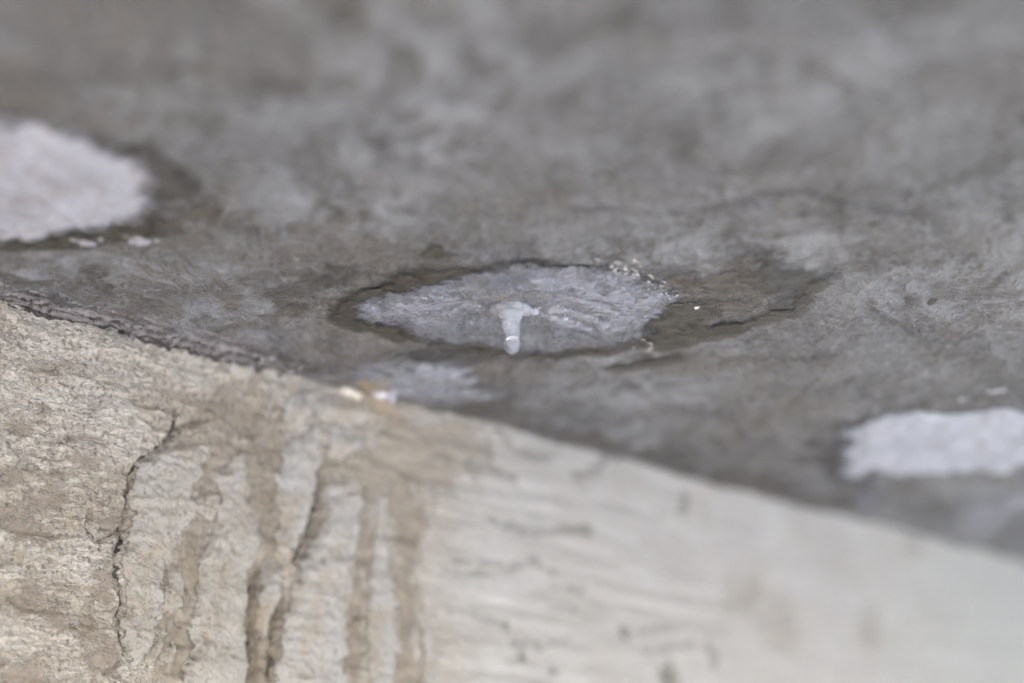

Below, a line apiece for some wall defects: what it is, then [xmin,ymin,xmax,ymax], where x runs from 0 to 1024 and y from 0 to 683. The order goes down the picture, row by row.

damp [0,115,226,252]
crack [85,413,195,663]
damp [140,375,289,683]
damp [258,246,1024,683]